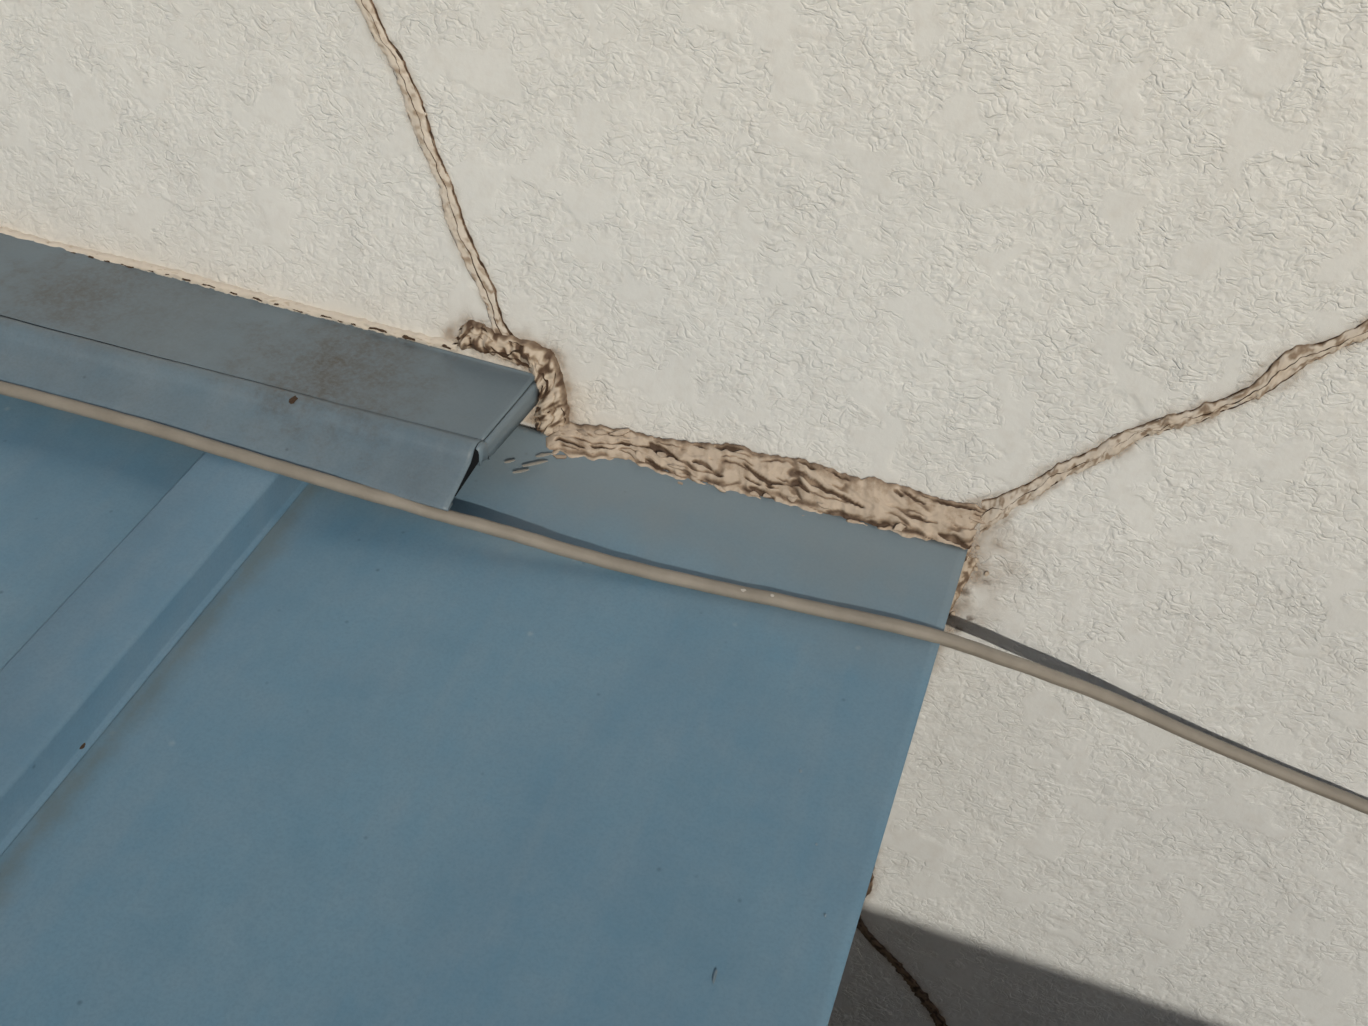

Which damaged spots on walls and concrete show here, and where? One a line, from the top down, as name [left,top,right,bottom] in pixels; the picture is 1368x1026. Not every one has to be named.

crack [355,0,566,423]
crack [964,319,1368,562]
crack [856,866,948,1026]